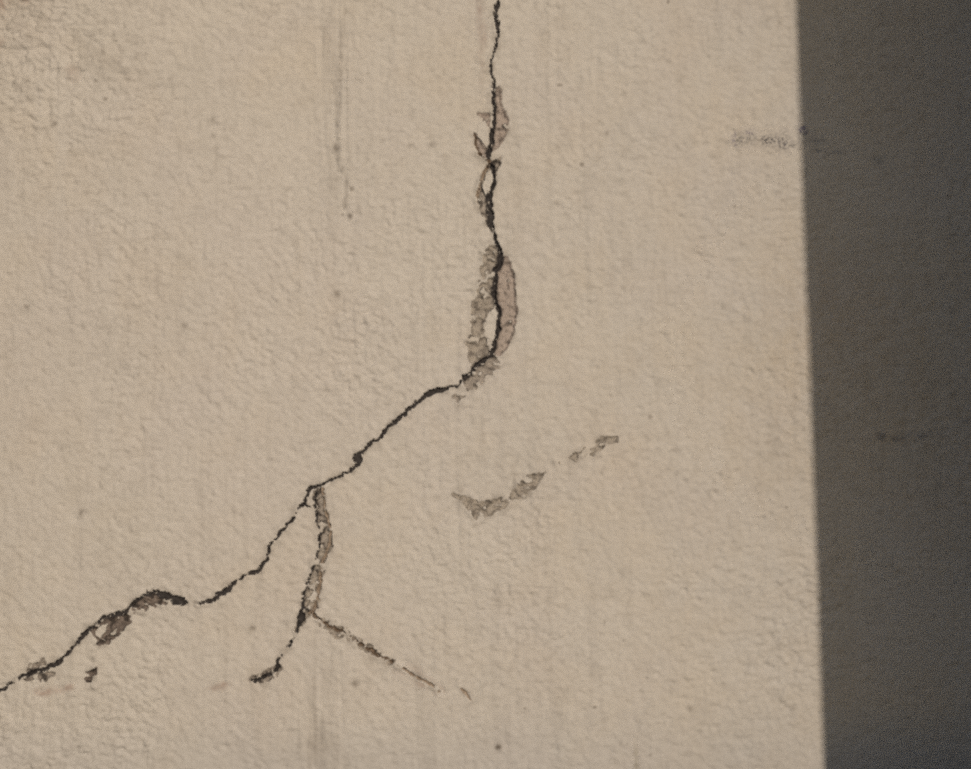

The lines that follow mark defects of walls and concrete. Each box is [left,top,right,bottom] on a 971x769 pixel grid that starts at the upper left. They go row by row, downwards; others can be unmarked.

peeling [473,86,510,233]
crack [0,0,505,701]
peeling [452,245,518,407]
peeling [452,472,545,521]
peeling [558,436,619,464]